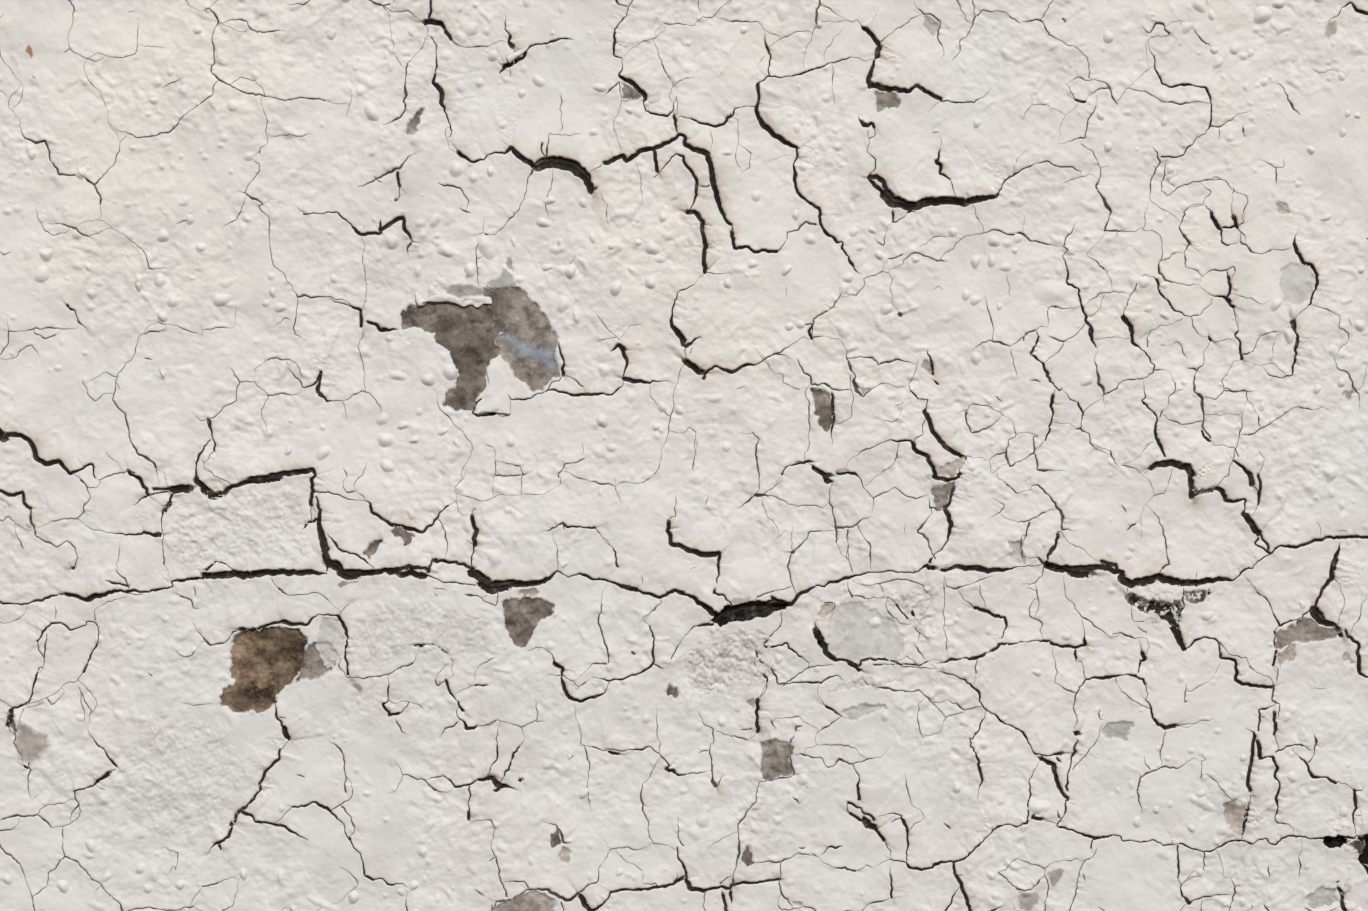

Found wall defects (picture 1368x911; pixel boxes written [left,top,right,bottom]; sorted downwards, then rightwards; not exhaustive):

crack [36,0,398,378]
crack [363,0,1162,484]
peeling [399,257,561,414]
peeling [810,388,835,433]
crack [862,22,1368,911]
flaking render [220,587,555,715]
crack [0,322,980,855]
flaking render [1128,585,1226,628]
crack [207,704,408,911]
crack [489,756,874,911]
peeling [760,738,794,782]
flaking render [1323,835,1368,864]